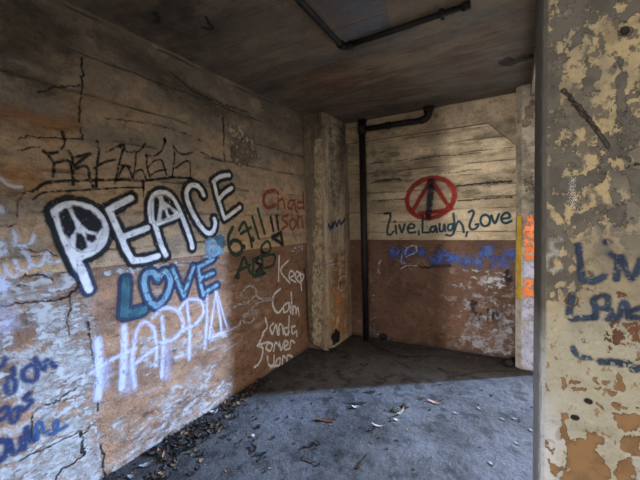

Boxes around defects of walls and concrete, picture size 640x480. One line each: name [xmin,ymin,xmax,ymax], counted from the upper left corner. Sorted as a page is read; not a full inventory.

crack [17,57,85,151]
peeling [546,0,640,301]
crack [0,273,81,334]
peeling [104,258,202,276]
peeling [452,277,515,356]
peeling [0,271,104,480]
crack [19,321,108,480]
peeling [545,372,640,480]